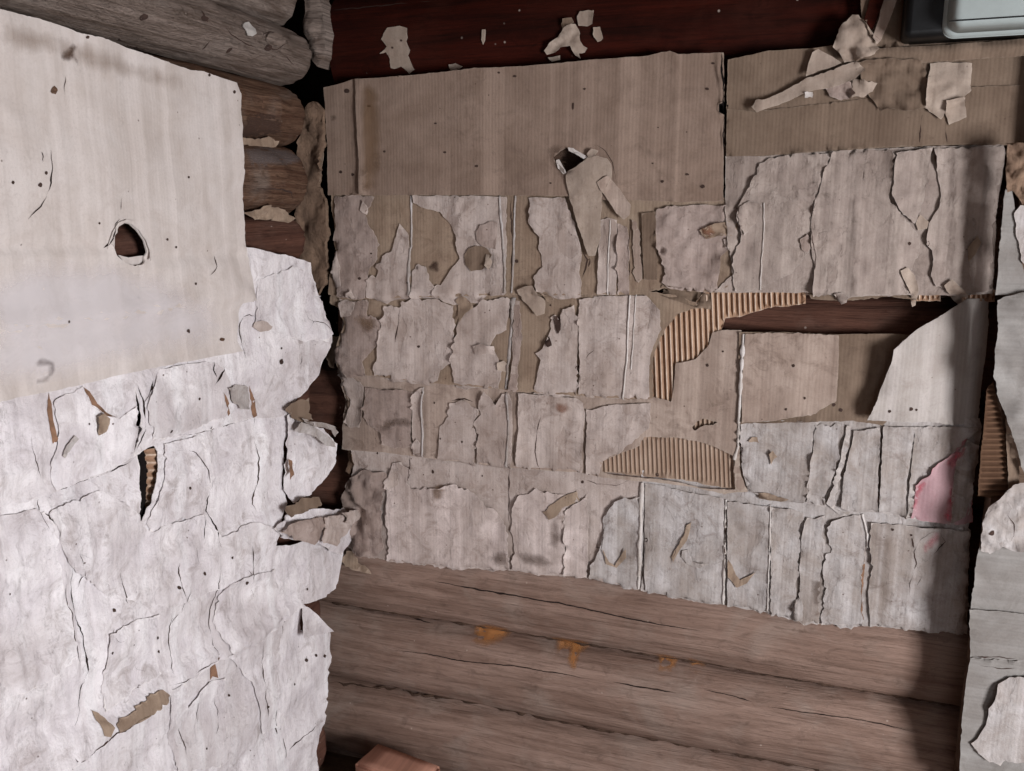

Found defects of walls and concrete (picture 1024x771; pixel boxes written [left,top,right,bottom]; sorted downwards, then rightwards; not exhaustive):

crack [31,383,154,490]
crack [66,557,89,725]
crack [168,418,260,685]
crack [262,646,316,749]
crack [397,650,586,679]
crack [427,579,697,631]
crack [616,682,674,693]
crack [859,548,867,620]
crack [76,716,149,762]